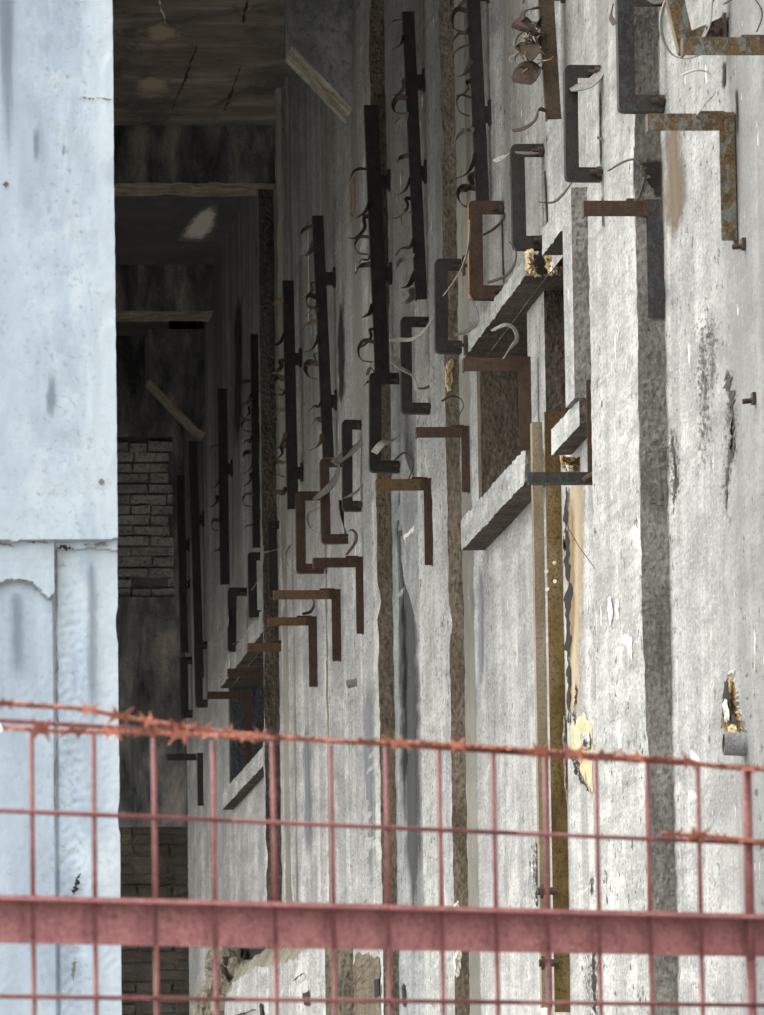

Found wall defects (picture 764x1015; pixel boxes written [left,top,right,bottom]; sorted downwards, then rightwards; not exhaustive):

water stain [0,0,11,90]
crack [0,541,108,822]
hole [720,668,747,736]
peeling [562,712,593,802]
hole [244,948,266,960]